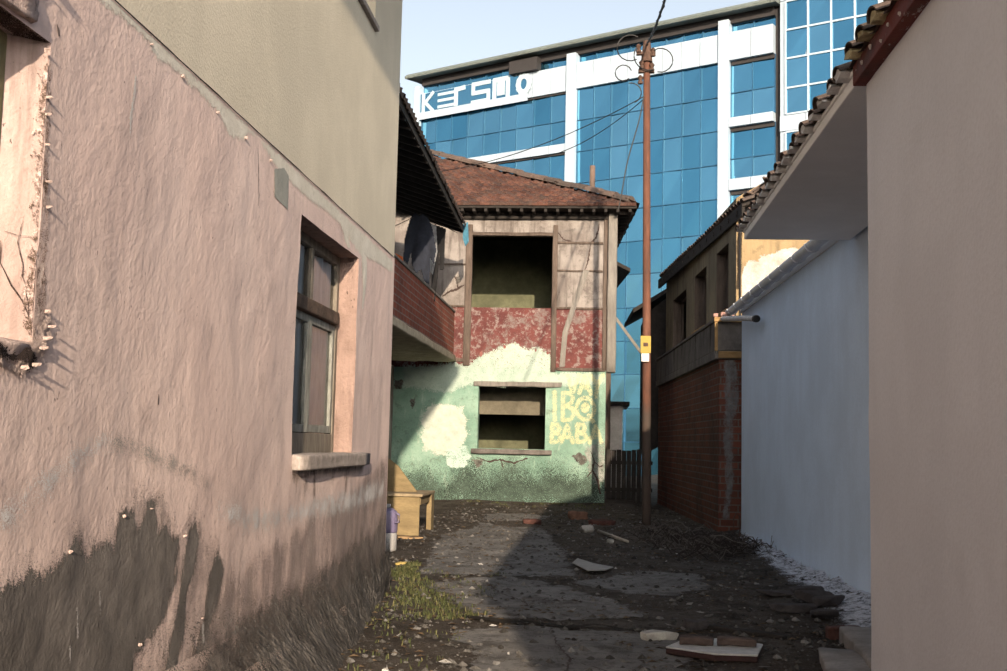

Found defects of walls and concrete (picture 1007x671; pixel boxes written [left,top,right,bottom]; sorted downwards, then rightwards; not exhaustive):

spalling [0,48,56,380]
flaking render [99,0,393,272]
damp [184,444,605,671]
peeling [394,342,606,468]
crack [587,451,603,494]